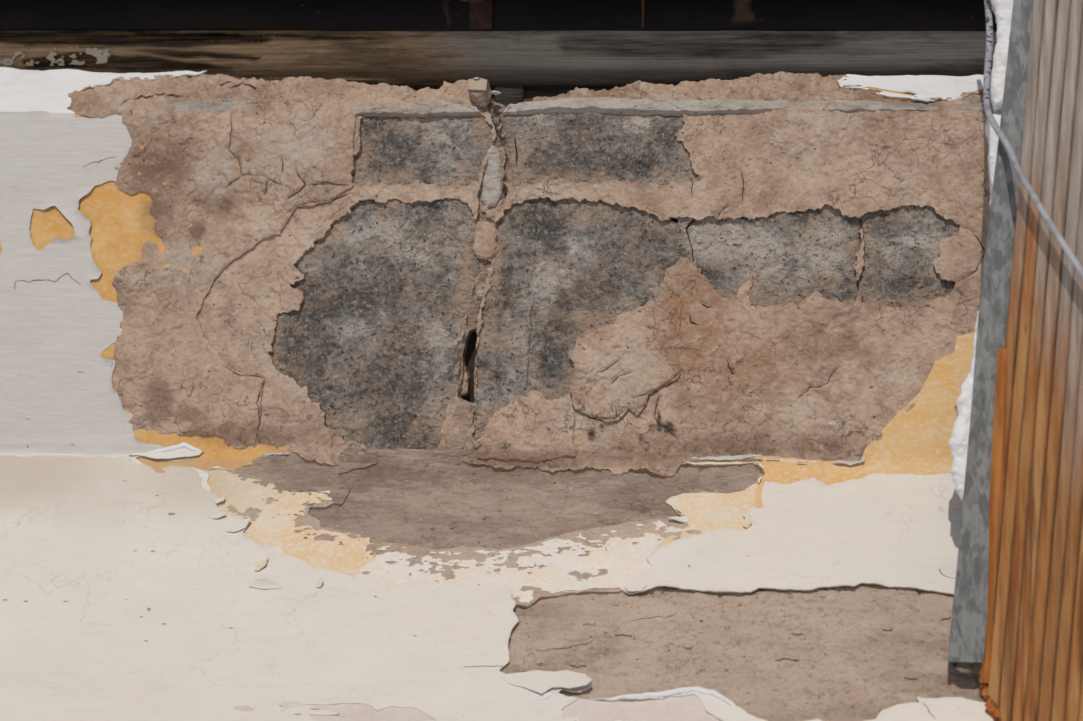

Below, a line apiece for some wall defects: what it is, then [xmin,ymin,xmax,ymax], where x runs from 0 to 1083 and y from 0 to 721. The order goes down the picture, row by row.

peeling [0,47,111,66]
crack [121,93,189,104]
crack [489,105,517,161]
crack [226,119,350,213]
peeling [30,206,75,251]
spalling [68,71,995,721]